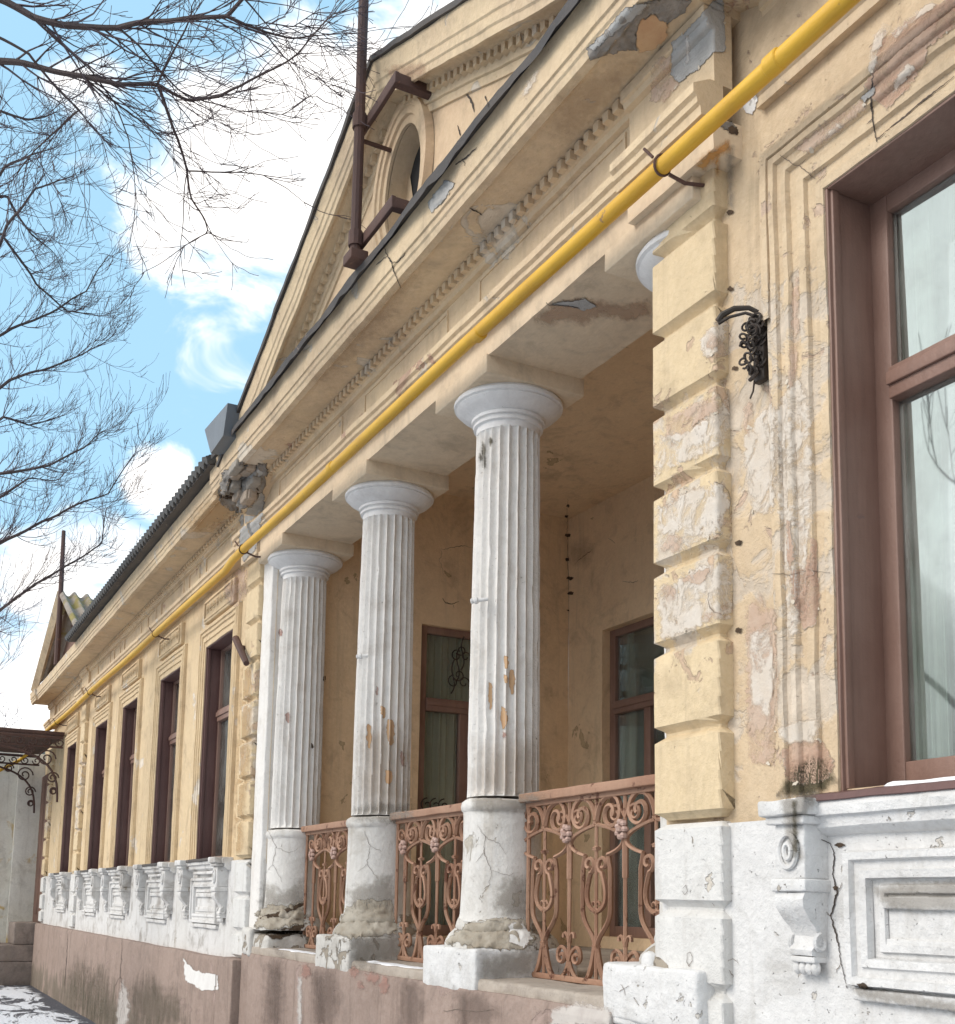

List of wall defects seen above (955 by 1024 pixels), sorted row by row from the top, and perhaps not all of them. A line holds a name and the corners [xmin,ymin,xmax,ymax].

peeling [589,0,726,102]
peeling [797,0,955,153]
crack [867,75,954,142]
spalling [218,459,268,606]
peeling [657,348,834,786]
peeling [488,656,516,738]
water stain [778,758,833,852]
crack [476,826,513,887]
peeling [183,957,219,991]
spalling [254,901,307,940]
spalling [445,917,536,951]
crack [823,840,868,989]